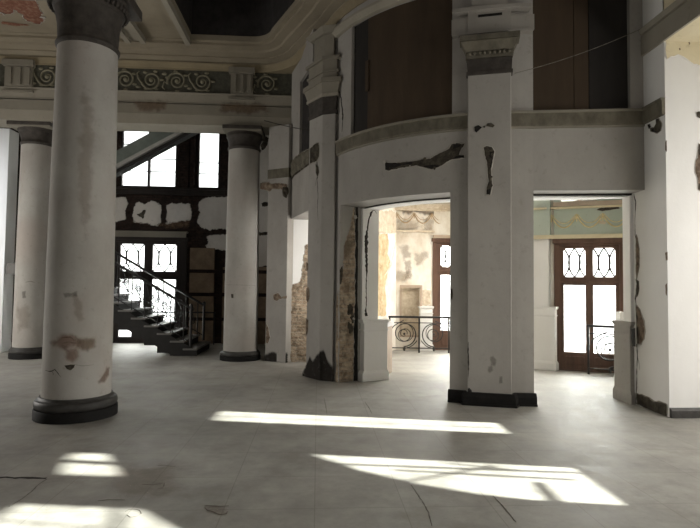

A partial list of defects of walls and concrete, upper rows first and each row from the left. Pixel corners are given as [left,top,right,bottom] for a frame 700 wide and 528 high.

peeling [0,0,46,26]
spalling [648,118,662,134]
spalling [383,142,465,172]
spalling [483,145,495,196]
peeling [115,196,227,251]
flaking render [273,244,310,362]
flaking render [335,207,357,383]